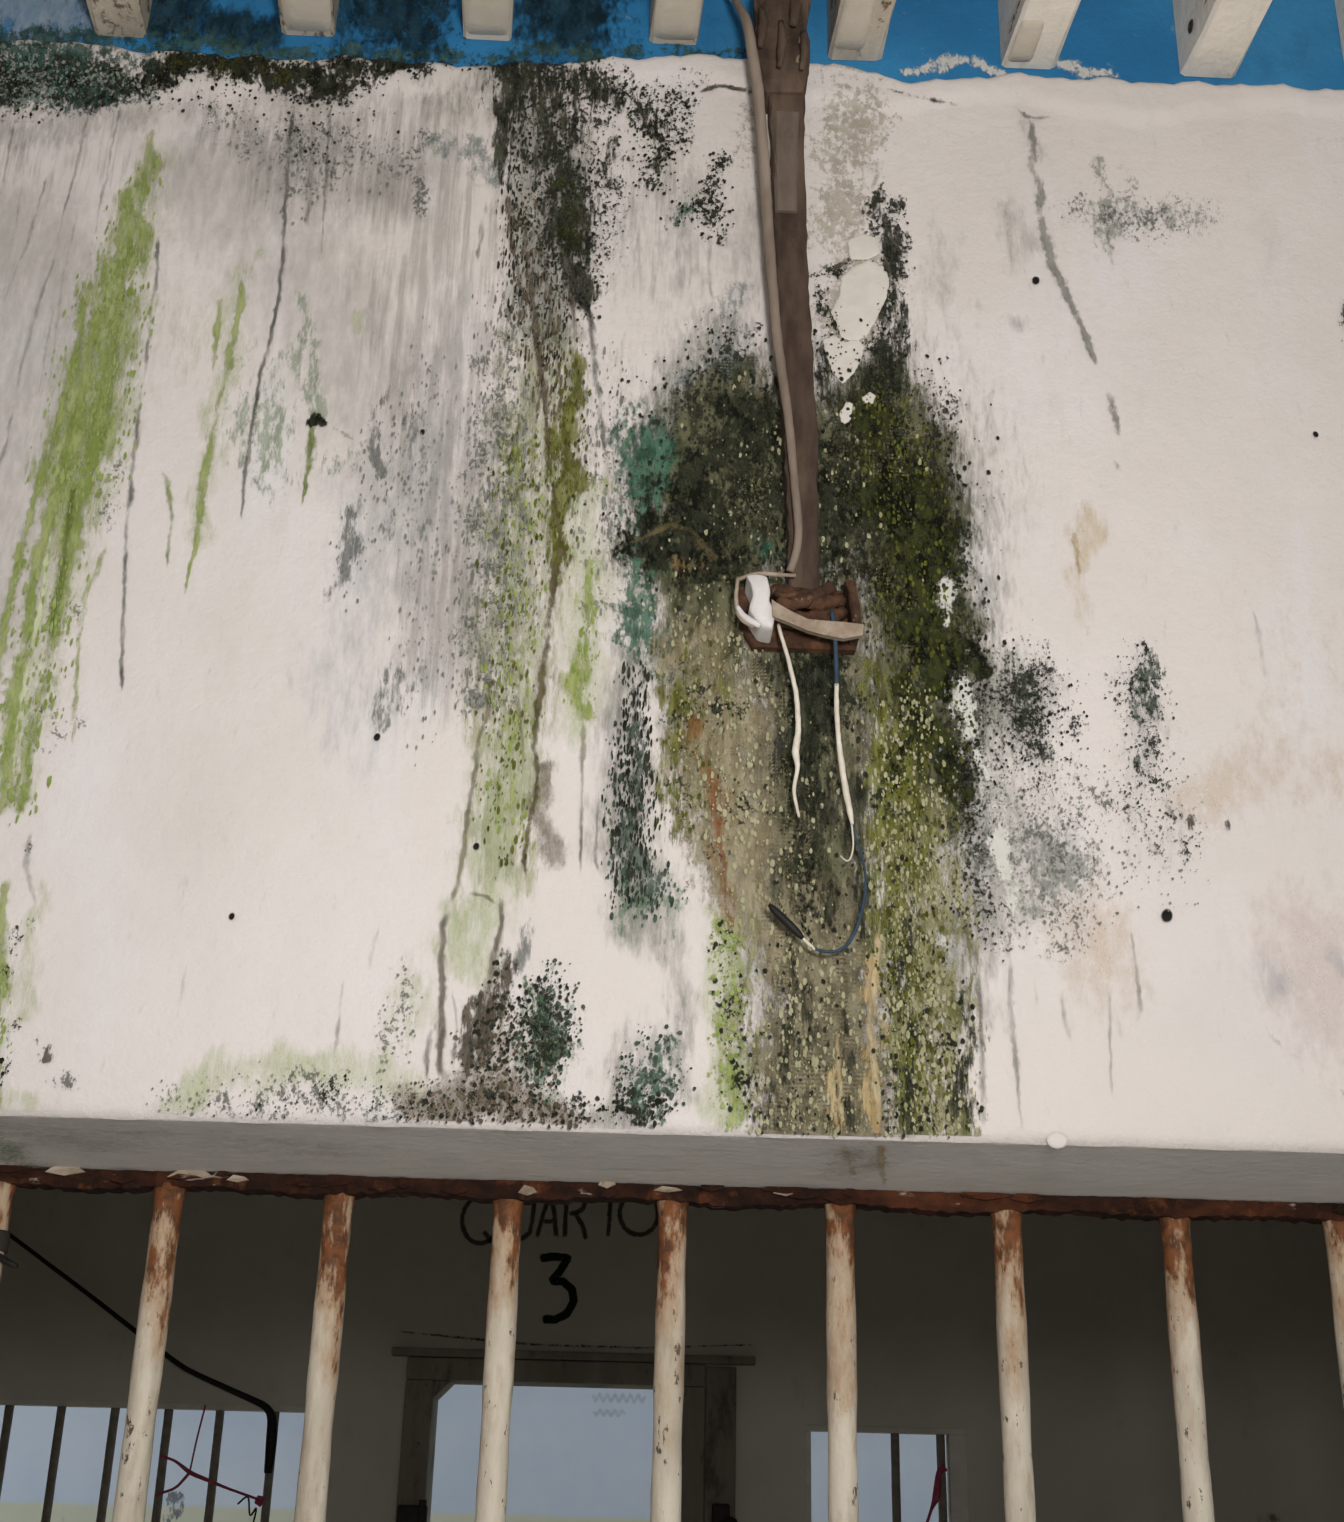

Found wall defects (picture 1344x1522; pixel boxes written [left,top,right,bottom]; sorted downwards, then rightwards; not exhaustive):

leakage [0,883,9,983]
leakage [0,0,746,872]
leakage [386,686,696,1130]
leakage [601,189,1215,1139]